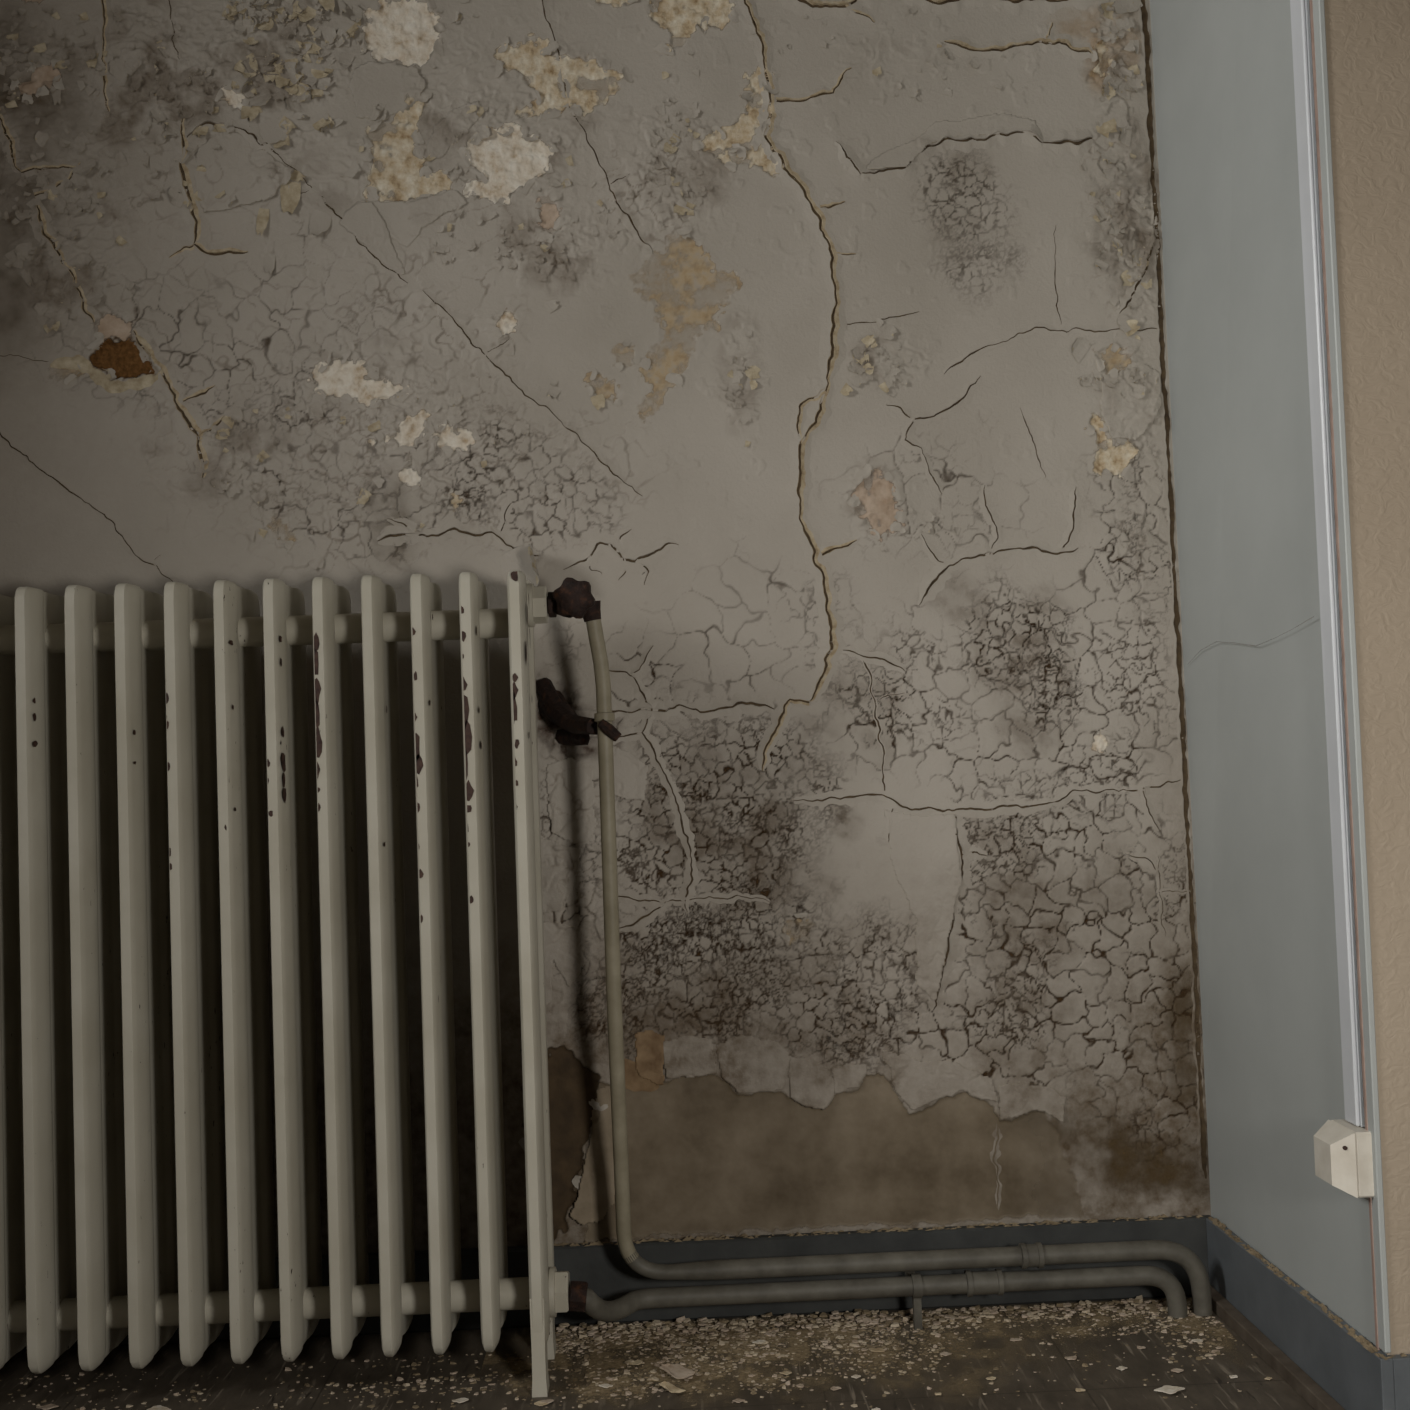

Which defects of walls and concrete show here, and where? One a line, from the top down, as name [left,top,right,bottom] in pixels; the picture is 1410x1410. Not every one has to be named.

crack [94,0,113,111]
peeling [135,0,633,244]
crack [0,424,181,583]
spalling [50,311,164,393]
crack [0,101,280,478]
spalling [307,349,481,491]
crack [168,113,679,585]
crack [536,0,1312,1179]
peeling [1072,337,1162,481]
peeling [884,809,962,1000]
peeling [547,1030,1082,1243]
water stain [1108,1131,1188,1186]